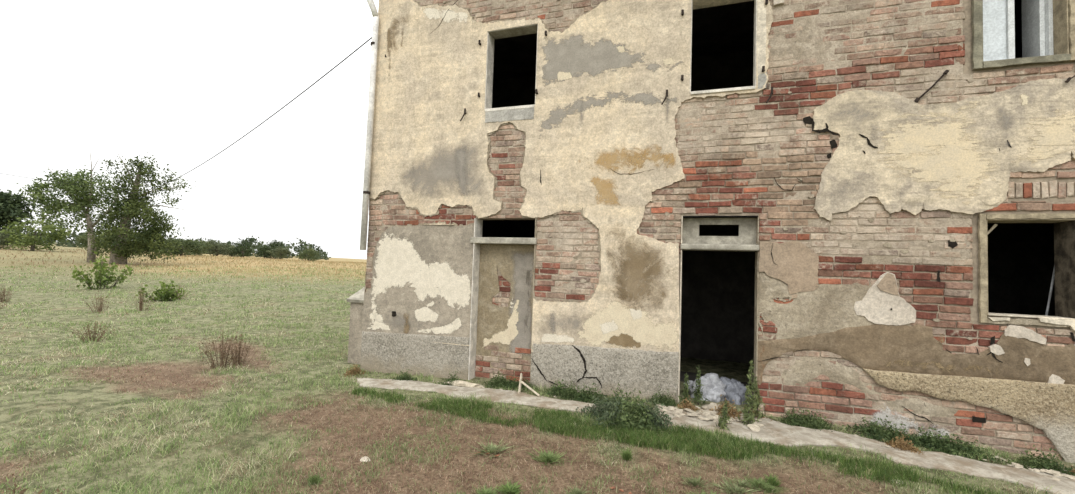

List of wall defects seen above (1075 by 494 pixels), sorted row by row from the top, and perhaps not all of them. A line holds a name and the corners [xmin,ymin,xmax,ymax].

peeling [413,0,683,86]
flaking render [637,0,1075,355]
peeling [364,122,601,334]
leakage [612,243,666,308]
flaking render [475,276,531,383]
crack [531,345,602,388]
peeling [541,301,678,350]
flaking render [757,349,1062,460]
peeling [1047,374,1065,384]